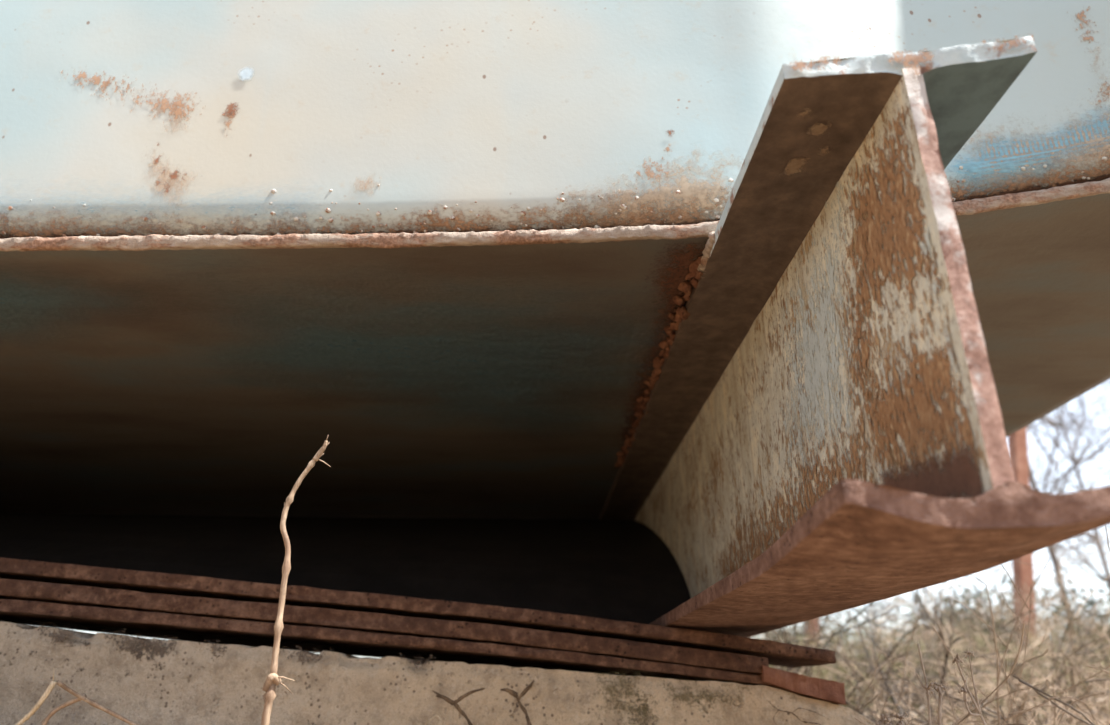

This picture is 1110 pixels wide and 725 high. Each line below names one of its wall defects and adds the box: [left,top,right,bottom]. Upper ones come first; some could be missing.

corrosion [792,56,839,72]
corrosion [888,48,934,75]
corrosion [61,70,194,124]
corrosion [222,103,238,130]
corrosion [946,82,1110,202]
corrosion [0,130,733,239]
corrosion [716,96,983,581]
crack [767,700,825,725]